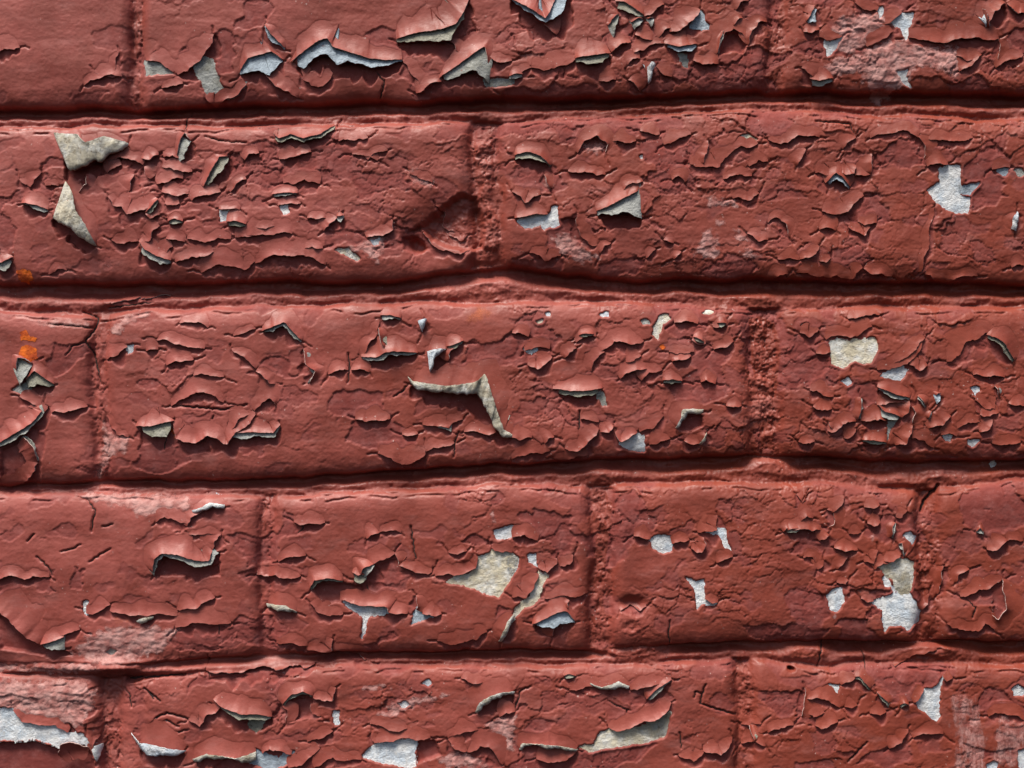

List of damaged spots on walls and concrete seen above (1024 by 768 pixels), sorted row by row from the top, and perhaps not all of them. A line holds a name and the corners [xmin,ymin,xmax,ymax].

peeling [143,0,767,108]
peeling [19,116,393,274]
peeling [670,121,877,236]
peeling [870,120,980,283]
peeling [0,354,88,487]
peeling [355,307,733,465]
peeling [798,304,1024,448]
peeling [0,565,231,650]
peeling [131,489,612,768]
peeling [781,488,1024,632]
peeling [0,706,104,762]
peeling [437,659,953,768]